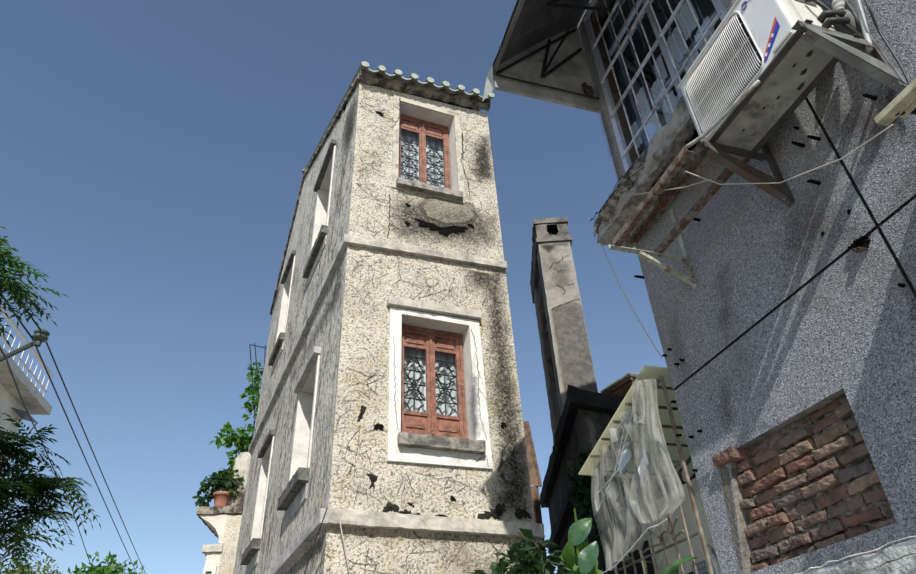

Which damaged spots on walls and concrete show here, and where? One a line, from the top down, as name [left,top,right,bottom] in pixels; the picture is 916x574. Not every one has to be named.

damp [344,102,356,151]
damp [475,138,491,178]
spalling [593,149,648,238]
crack [551,255,576,310]
damp [471,270,527,513]